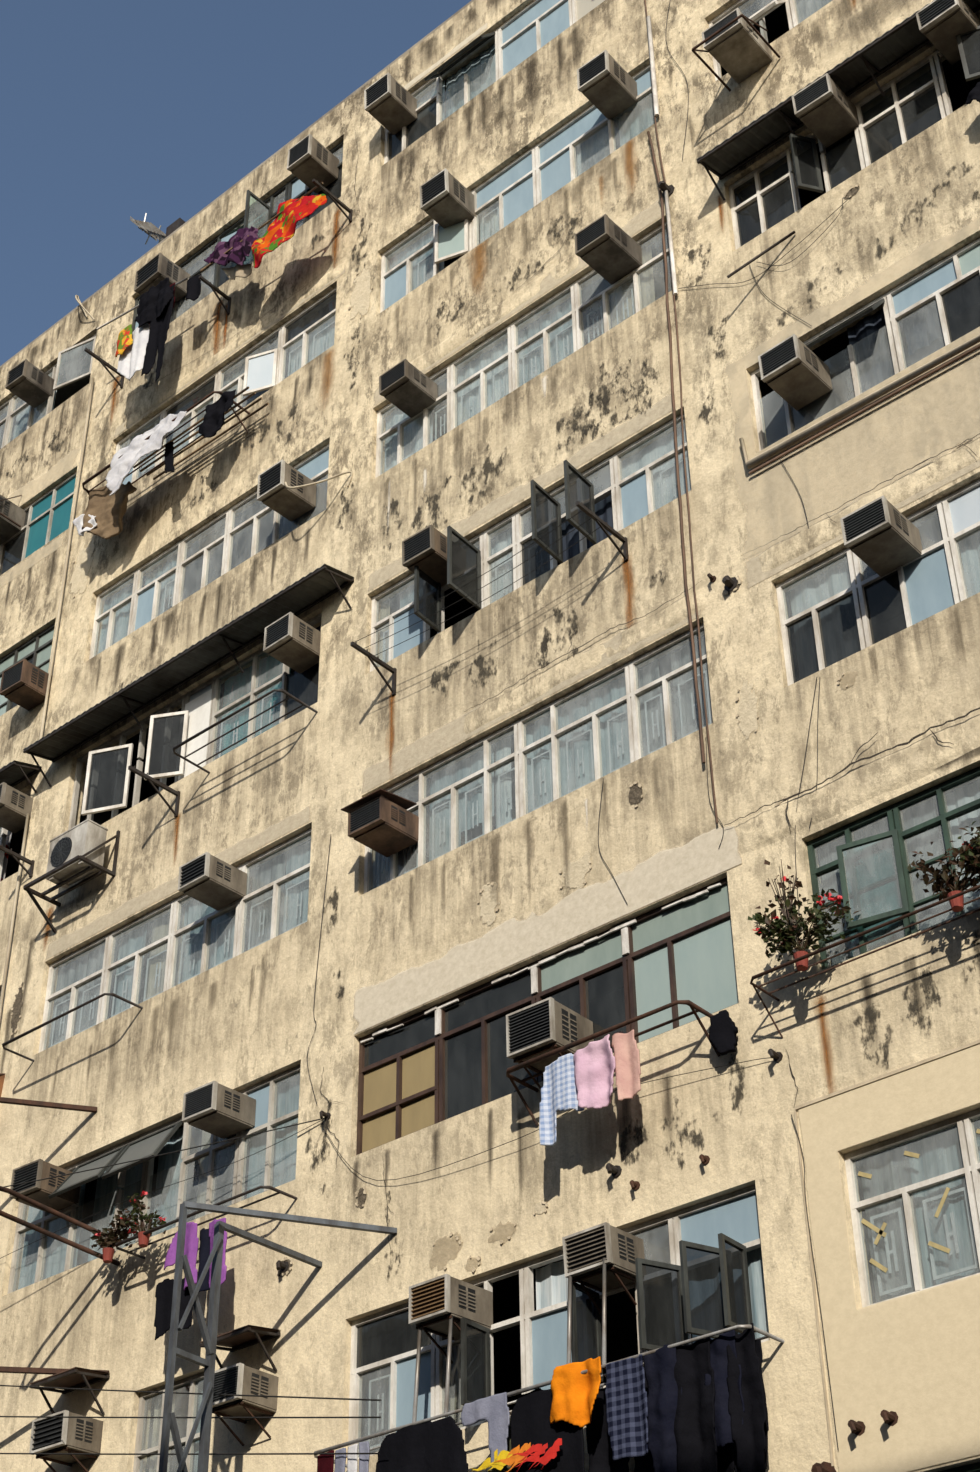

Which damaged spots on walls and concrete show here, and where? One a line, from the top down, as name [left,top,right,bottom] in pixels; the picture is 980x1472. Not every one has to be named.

water stain [687,245,710,285]
water stain [708,316,728,359]
water stain [556,359,657,449]
water stain [699,396,716,425]
water stain [383,444,506,549]
rust [623,561,631,617]
crack [725,707,980,827]
rust [819,1000,830,1081]